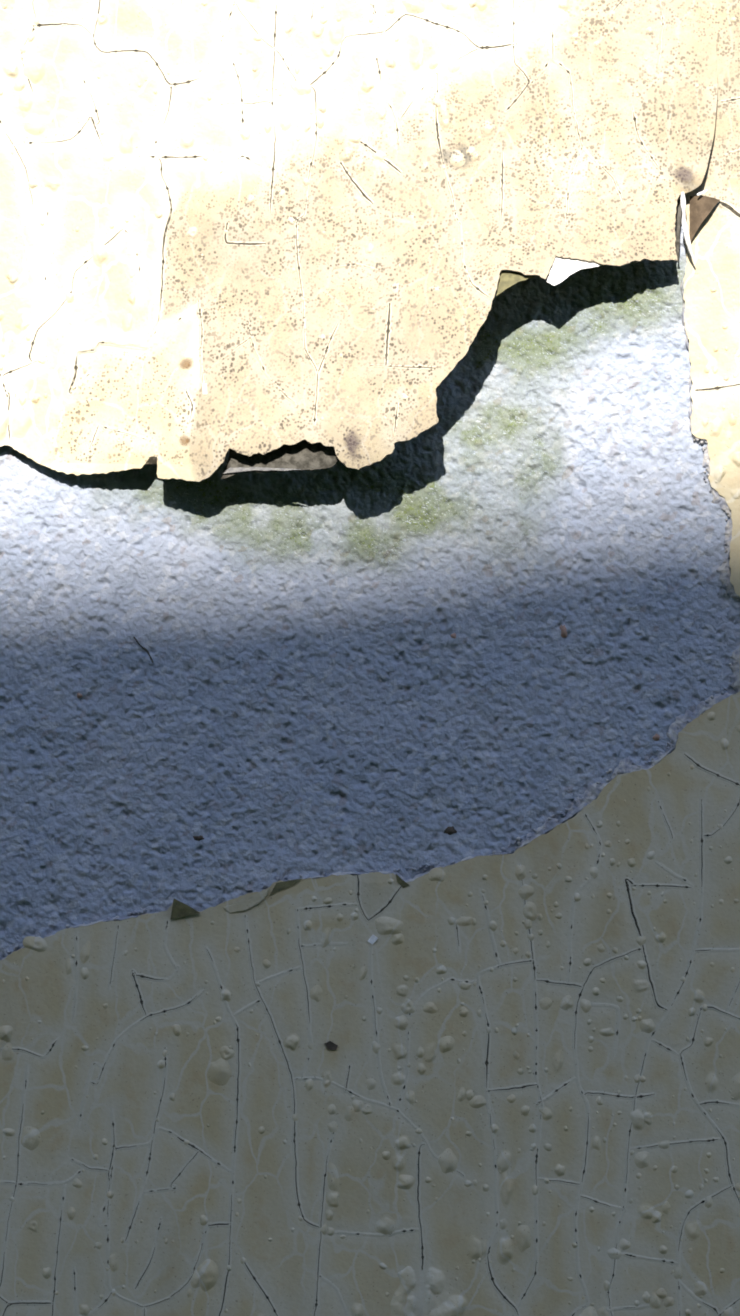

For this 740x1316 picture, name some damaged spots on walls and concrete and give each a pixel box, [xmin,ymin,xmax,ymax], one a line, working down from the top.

crack [721,96,740,105]
crack [630,106,663,172]
crack [0,0,626,444]
crack [716,198,740,220]
crack [695,382,740,393]
spalling [0,0,740,960]
crack [0,752,740,1316]